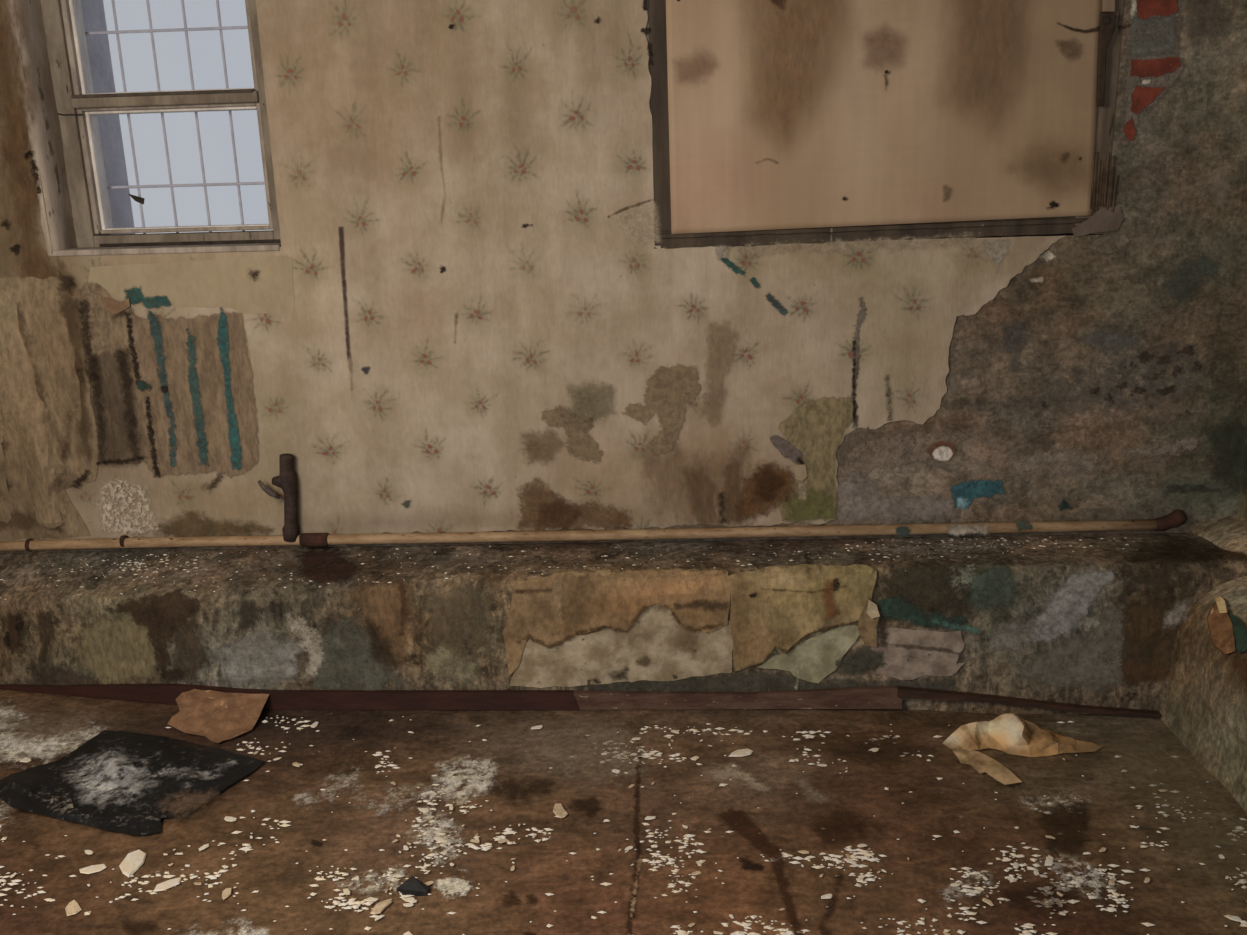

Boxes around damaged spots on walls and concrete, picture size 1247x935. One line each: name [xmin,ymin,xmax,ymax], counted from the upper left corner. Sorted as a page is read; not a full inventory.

damp [758,0,832,127]
flaking render [1121,0,1184,146]
flaking render [743,234,1009,266]
peeling [124,286,171,309]
flaking render [1027,344,1202,416]
damp [525,324,743,525]
flaking render [835,426,984,523]
flaking render [1009,450,1098,478]
flaking render [1121,436,1206,457]
flaking render [870,618,966,680]
crack [625,744,642,935]